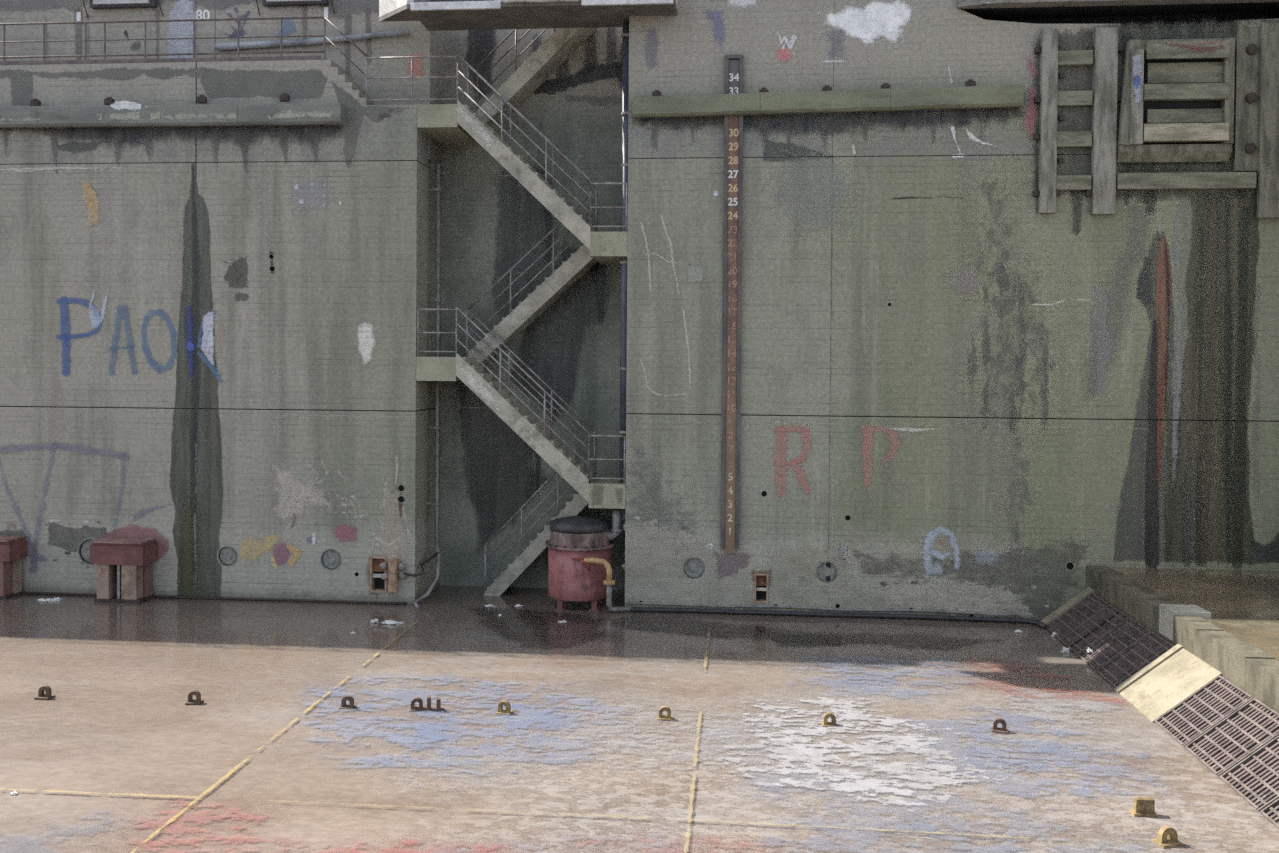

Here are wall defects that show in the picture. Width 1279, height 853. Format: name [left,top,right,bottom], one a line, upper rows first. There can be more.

damp [0,0,403,172]
damp [638,116,724,139]
damp [743,107,1021,161]
damp [1056,147,1091,176]
damp [1057,65,1092,131]
damp [1058,30,1093,50]
damp [1108,22,1235,121]
damp [1116,138,1234,174]
damp [170,164,223,597]
rust [1145,237,1170,568]
damp [1114,171,1279,568]
damp [459,386,546,543]